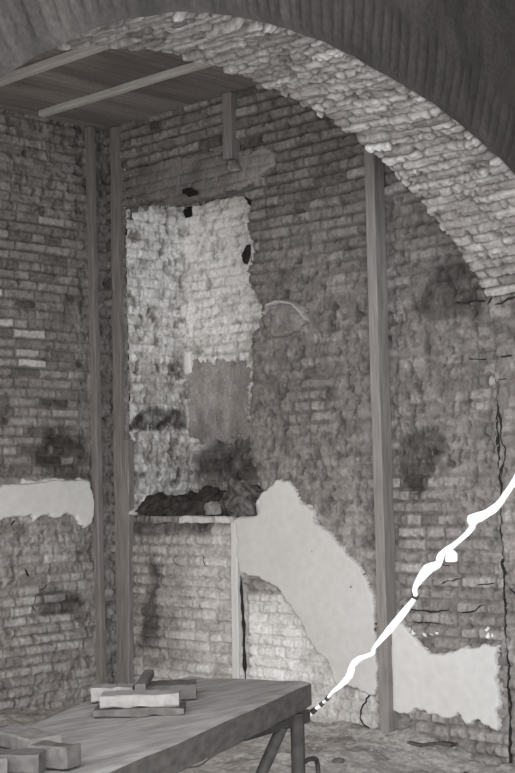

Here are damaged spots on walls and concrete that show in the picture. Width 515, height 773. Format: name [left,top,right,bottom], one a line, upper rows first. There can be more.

crack [455,296,515,305]
crack [442,378,515,763]
crack [411,605,483,625]